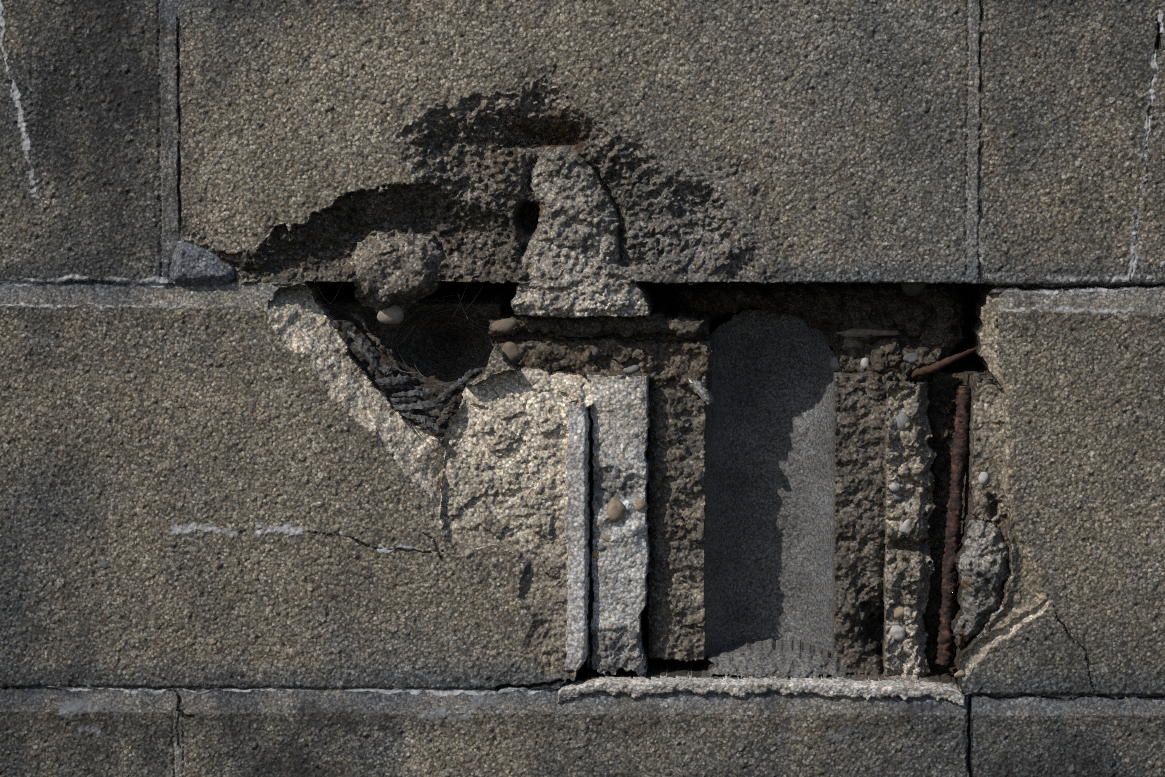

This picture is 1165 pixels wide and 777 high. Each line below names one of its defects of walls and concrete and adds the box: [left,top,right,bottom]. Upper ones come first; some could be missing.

crack [1130,16,1162,282]
spalling [184,74,786,692]
crack [308,531,444,562]